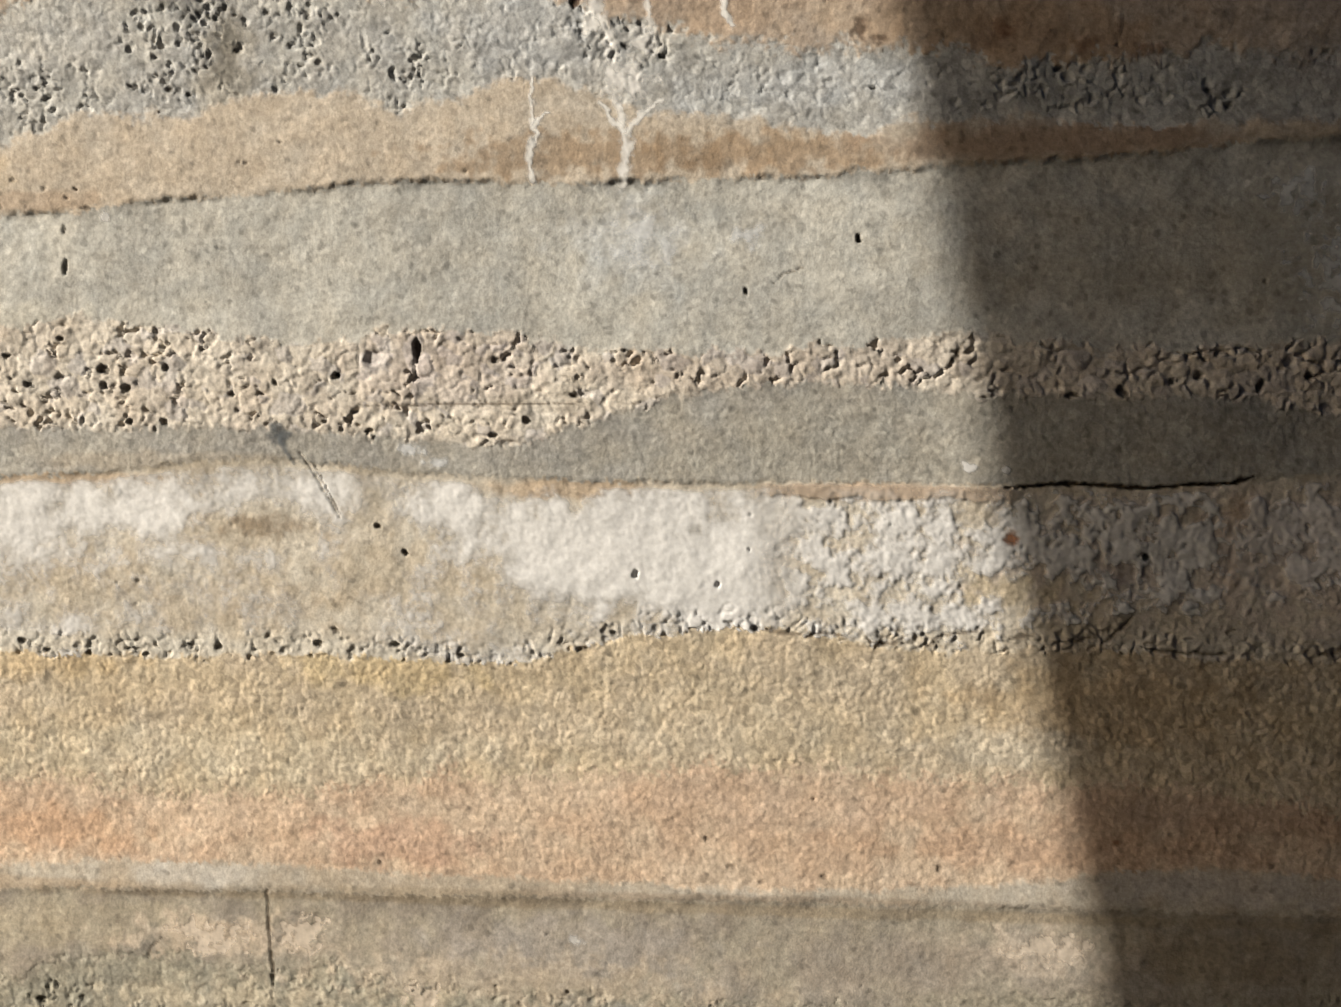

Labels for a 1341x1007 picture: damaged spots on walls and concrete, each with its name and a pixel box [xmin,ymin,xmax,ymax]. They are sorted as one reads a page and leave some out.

leakage [720,0,734,26]
leakage [525,77,549,183]
leakage [581,0,664,188]
crack [1016,476,1253,489]
crack [266,890,274,982]